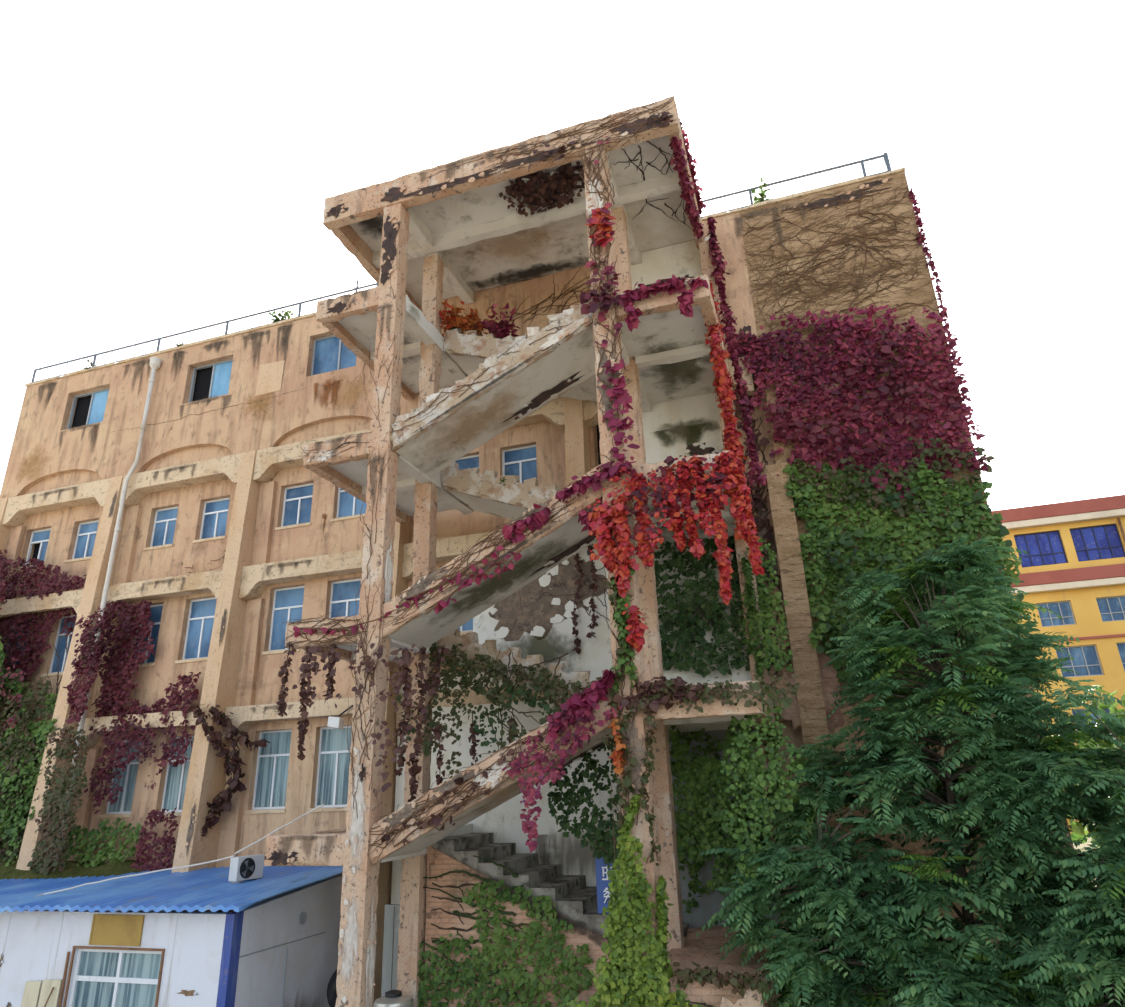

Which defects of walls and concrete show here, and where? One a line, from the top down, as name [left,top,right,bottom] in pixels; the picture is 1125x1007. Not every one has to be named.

spalling [324,203,348,218]
damp [244,325,291,364]
damp [125,359,150,384]
damp [172,351,184,371]
damp [650,346,702,384]
damp [39,382,56,402]
damp [181,395,229,415]
damp [60,424,97,444]
damp [655,430,669,444]
damp [687,423,704,449]
spalling [488,534,608,641]